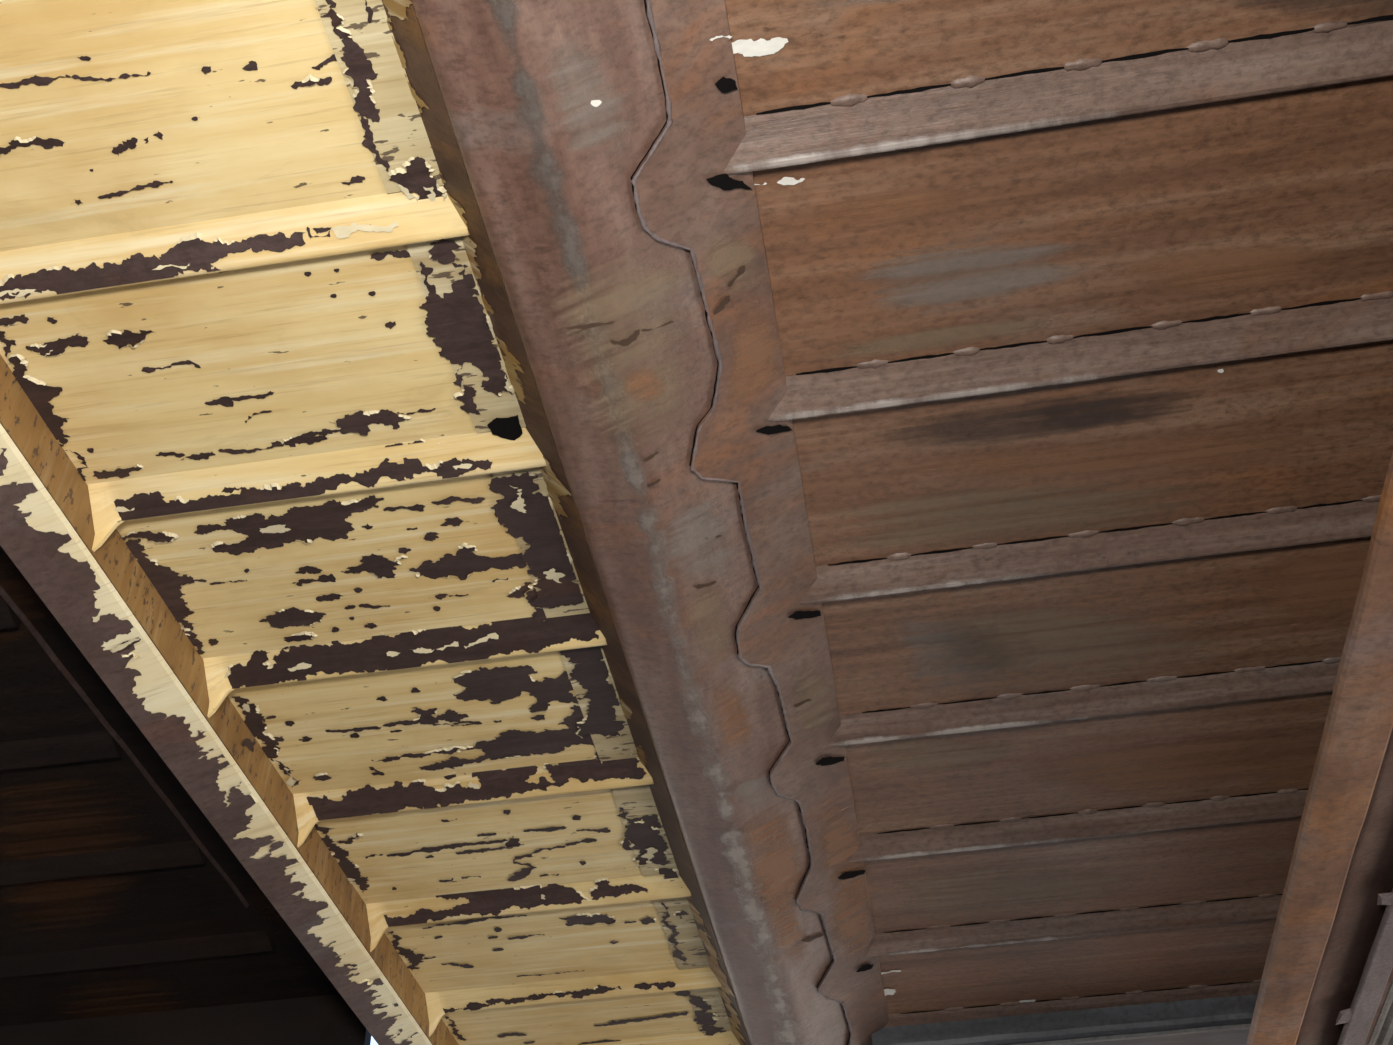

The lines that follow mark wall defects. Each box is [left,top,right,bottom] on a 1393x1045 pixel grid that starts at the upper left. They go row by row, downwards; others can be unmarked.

peeling [291,0,380,122]
peeling [710,35,788,57]
peeling [0,136,66,155]
peeling [112,132,163,156]
peeling [388,156,448,203]
peeling [0,232,306,481]
peeling [419,239,515,415]
peeling [114,409,646,893]
peeling [0,448,413,1045]
peeling [602,807,679,879]
peeling [384,878,648,970]
peeling [443,981,726,1036]